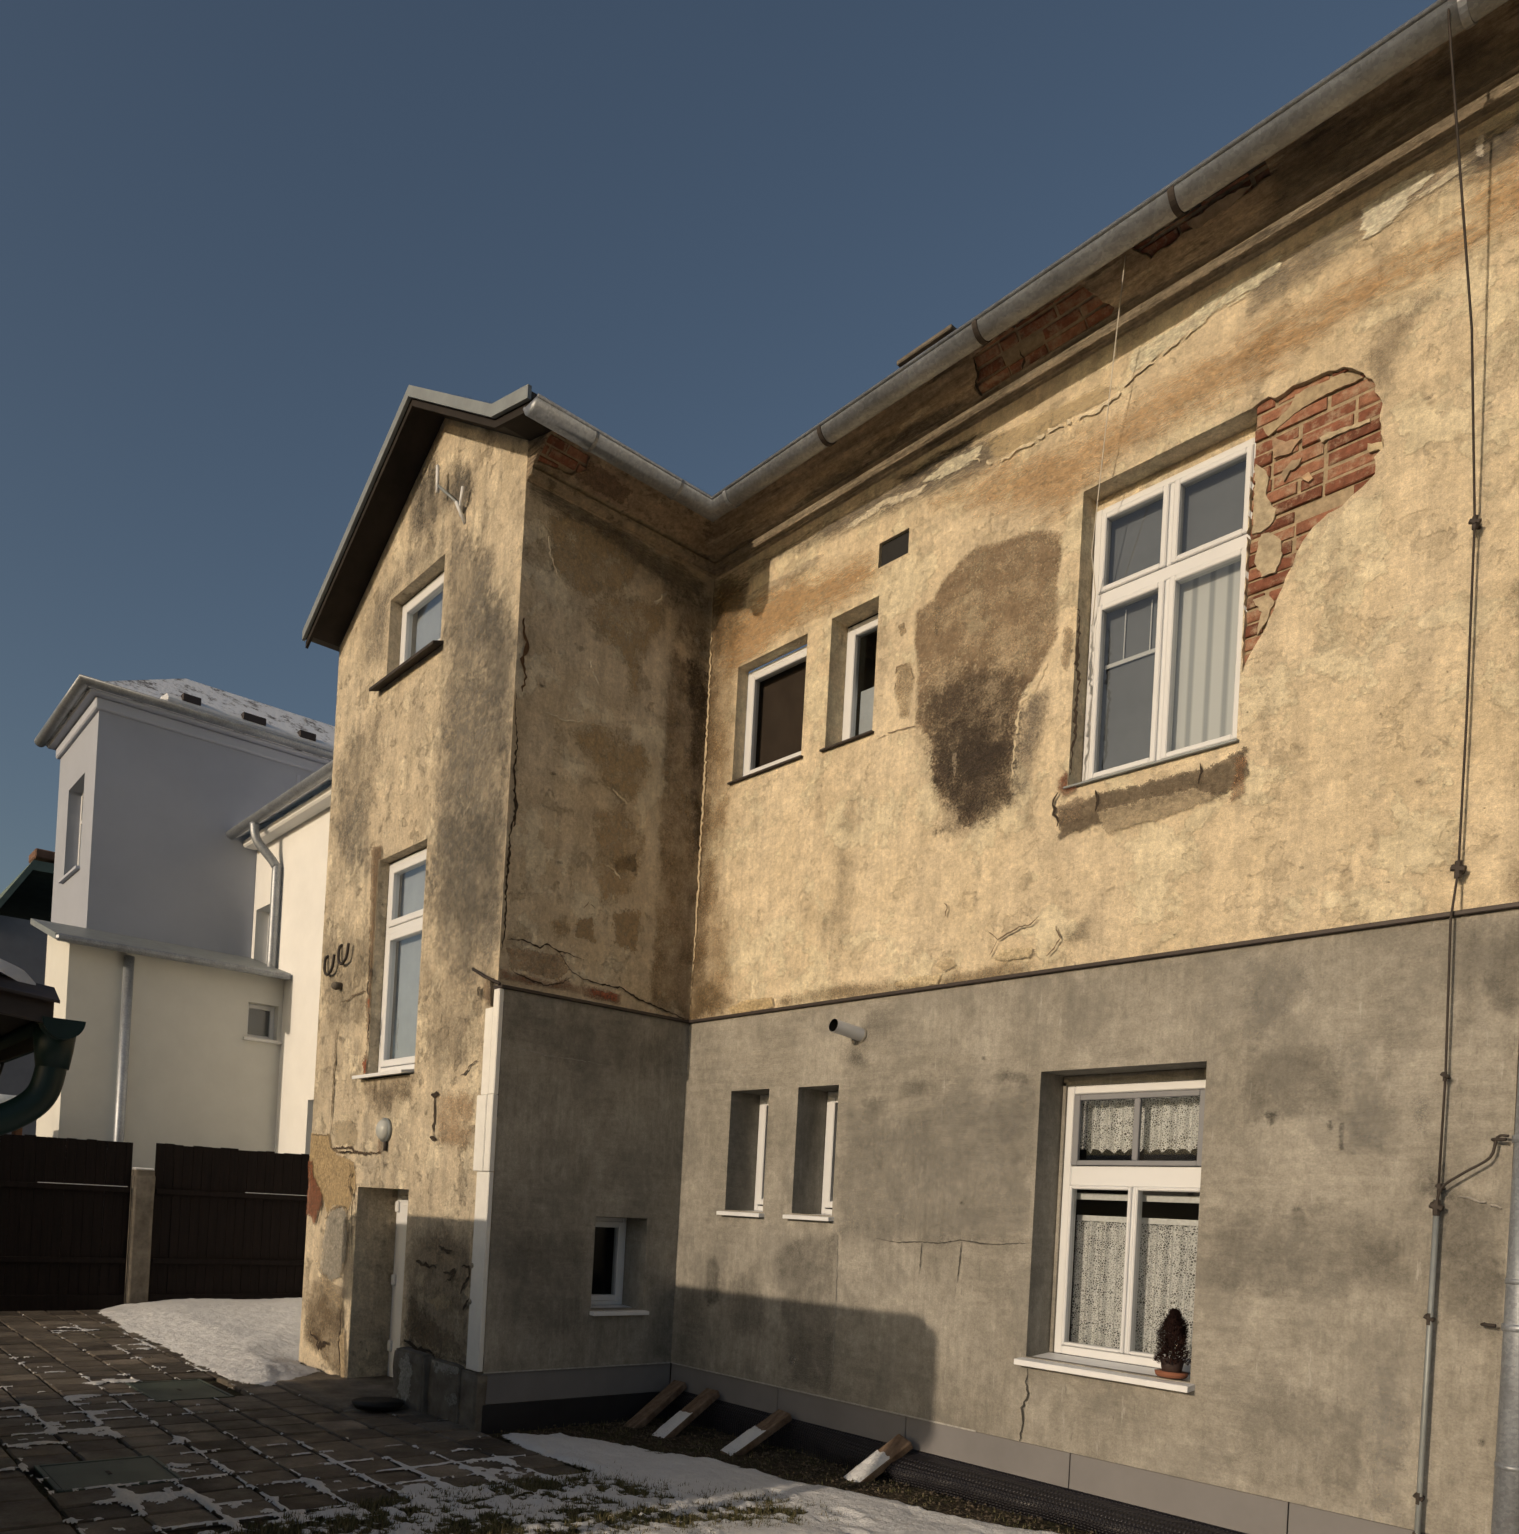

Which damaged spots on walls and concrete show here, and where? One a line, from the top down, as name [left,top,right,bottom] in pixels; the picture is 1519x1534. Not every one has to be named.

leakage [1254,120,1519,311]
peeling [923,255,1282,482]
leakage [412,467,474,531]
flaking render [1244,369,1384,663]
leakage [431,544,509,954]
crack [500,618,689,1020]
leakage [532,434,1001,1016]
leakage [915,531,1062,834]
flaking render [1052,746,1249,839]
peeling [305,1133,381,1378]
crack [877,1238,1025,1281]
crack [1019,1369,1029,1441]